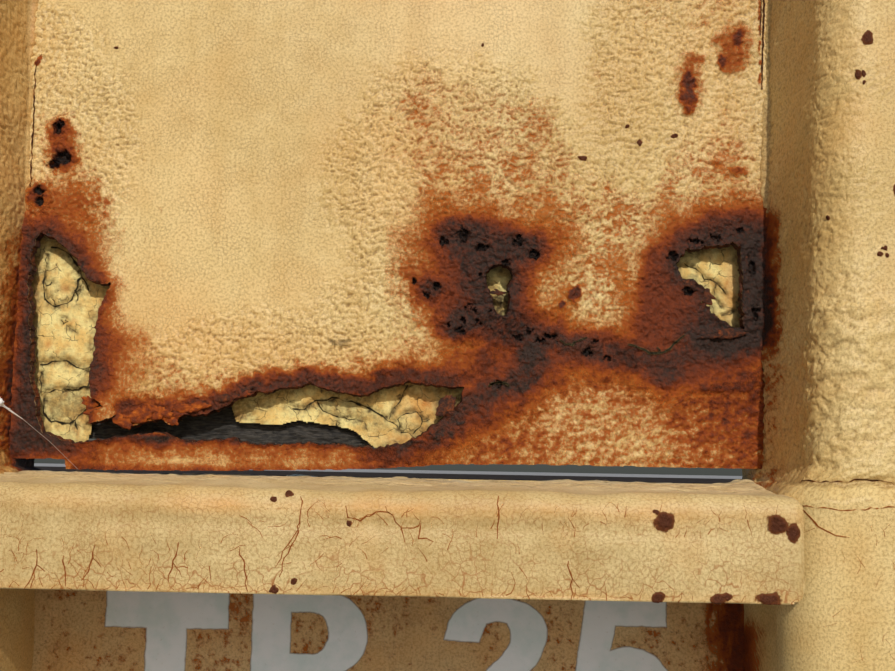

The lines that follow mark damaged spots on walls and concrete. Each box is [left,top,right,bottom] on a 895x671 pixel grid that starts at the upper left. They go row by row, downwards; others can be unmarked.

corrosion [711,0,762,84]
corrosion [677,52,705,115]
corrosion [0,78,783,488]
peeling [681,279,716,305]
peeling [81,396,103,415]
peeling [112,386,254,430]
peeling [435,394,456,416]
crack [0,496,461,596]
crack [476,496,631,601]
crack [675,506,752,539]
corrosion [193,593,252,671]
corrosion [672,603,762,671]